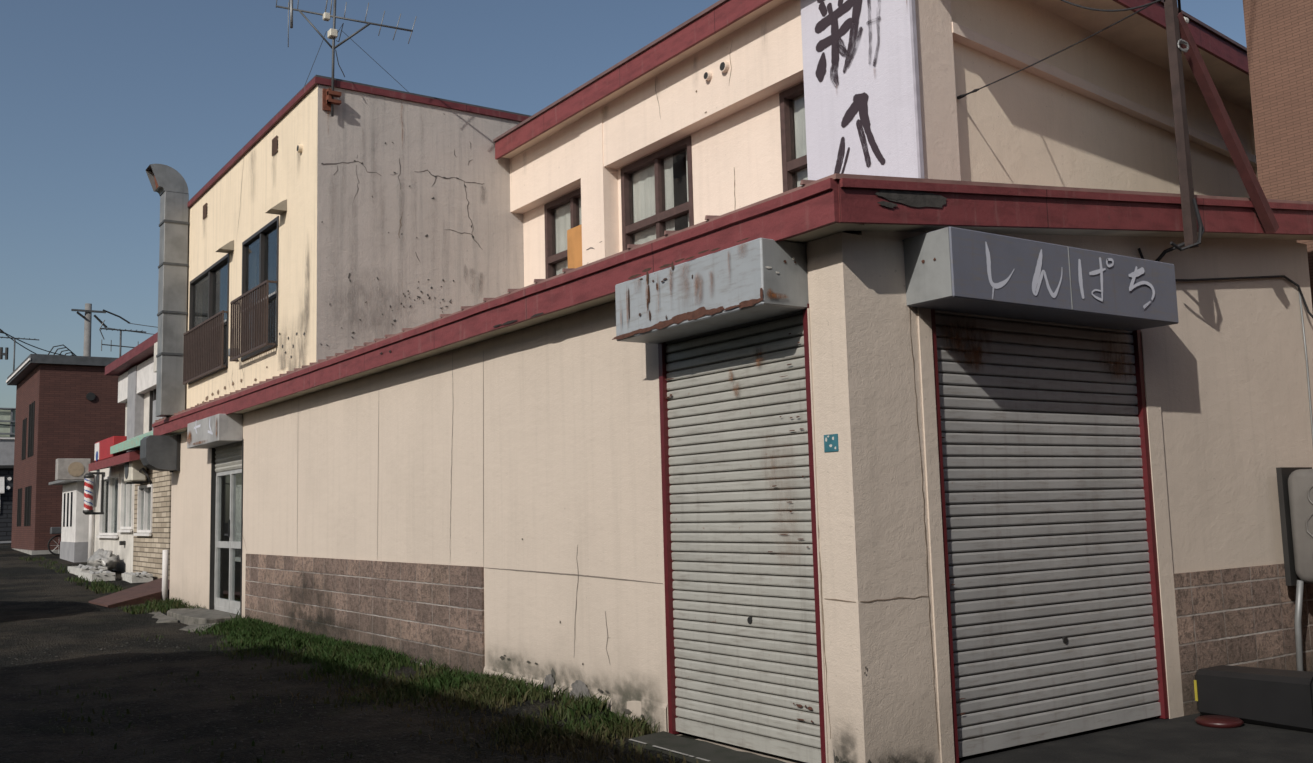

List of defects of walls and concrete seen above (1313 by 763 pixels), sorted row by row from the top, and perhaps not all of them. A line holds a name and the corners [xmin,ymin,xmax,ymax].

crack [323,141,483,260]
peeling [875,189,948,208]
peeling [628,248,720,321]
crack [574,545,610,662]